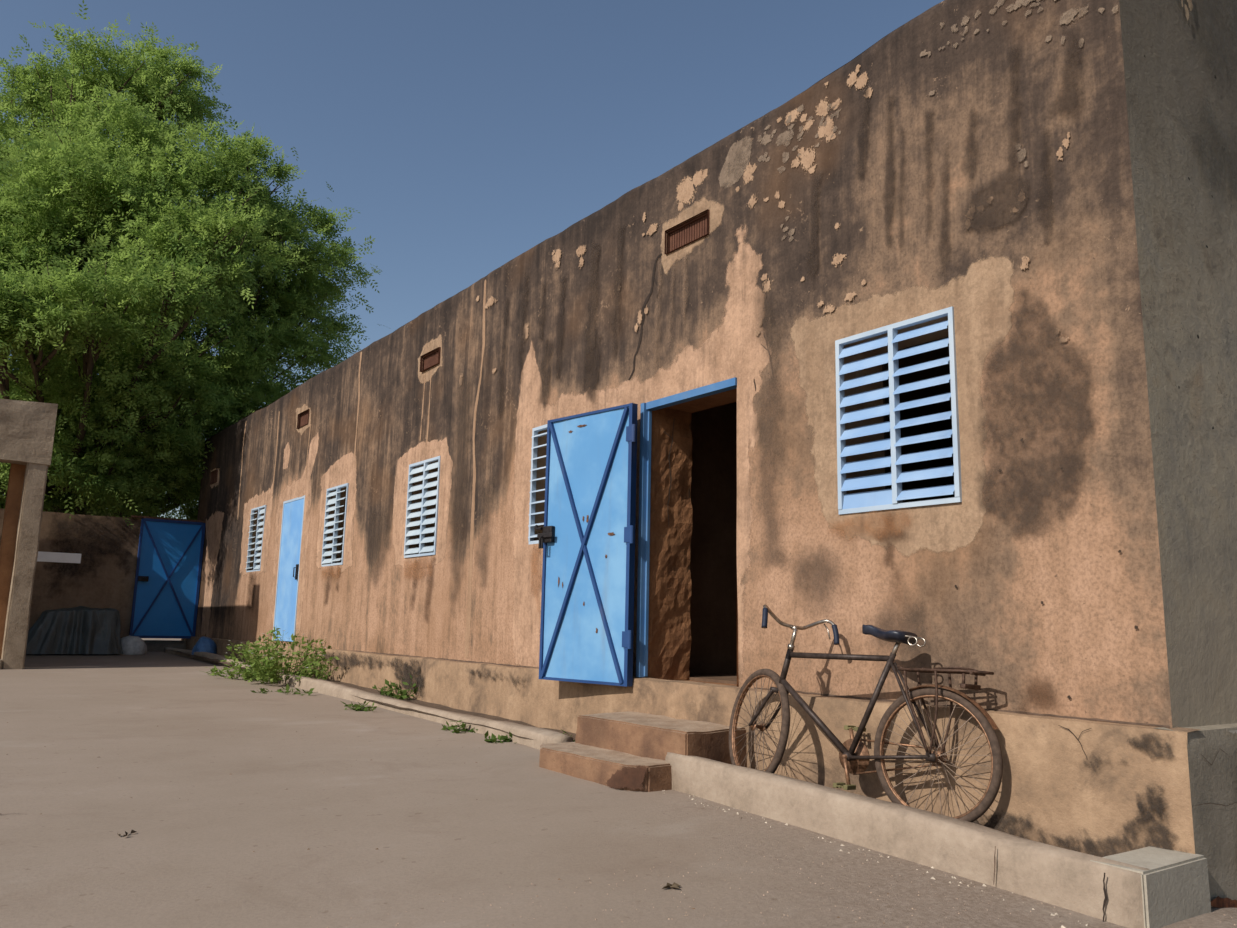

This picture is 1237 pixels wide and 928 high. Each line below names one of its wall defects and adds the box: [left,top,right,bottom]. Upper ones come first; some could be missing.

flaking render [735,82,842,241]
flaking render [846,64,873,98]
water stain [884,97,903,244]
water stain [925,112,948,247]
water stain [964,47,1052,241]
flaking render [920,0,1118,57]
crack [629,253,662,380]
flaking render [831,253,847,267]
water stain [981,293,1093,534]
water stain [1127,733,1172,758]
water stain [972,787,1175,857]